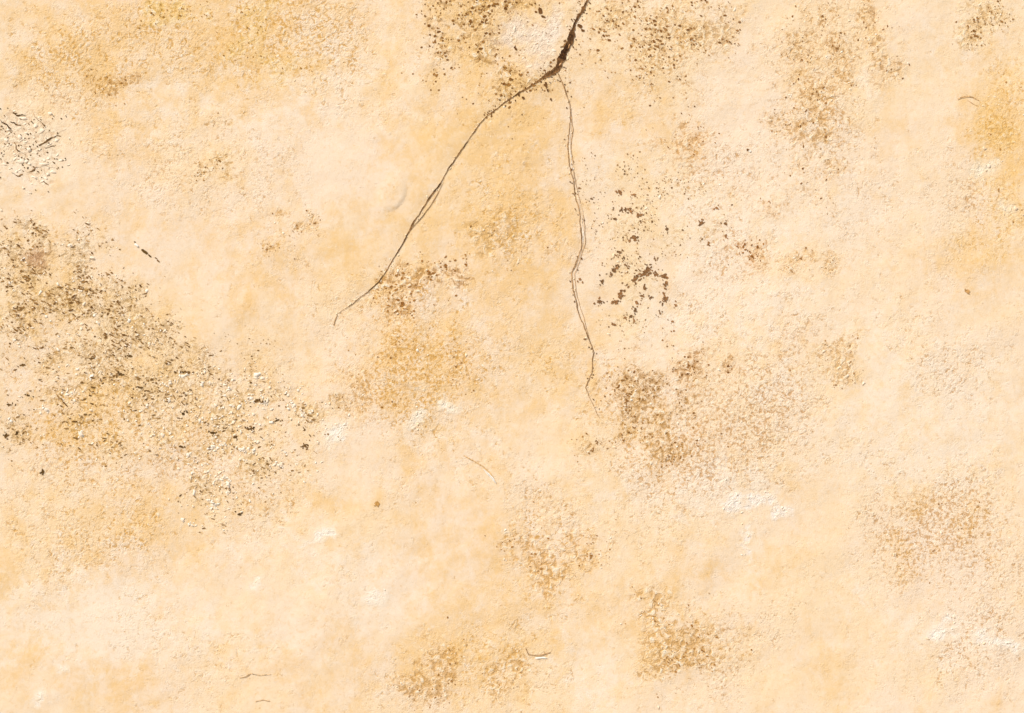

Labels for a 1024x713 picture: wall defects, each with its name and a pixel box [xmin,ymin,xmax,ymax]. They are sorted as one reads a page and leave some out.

crack [333,0,600,415]